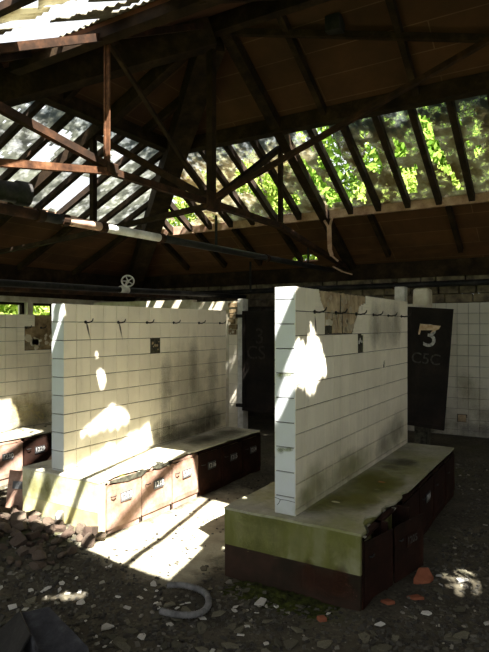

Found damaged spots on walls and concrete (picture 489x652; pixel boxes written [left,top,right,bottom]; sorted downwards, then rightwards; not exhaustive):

spalling [25,315,52,350]
spalling [319,291,365,352]